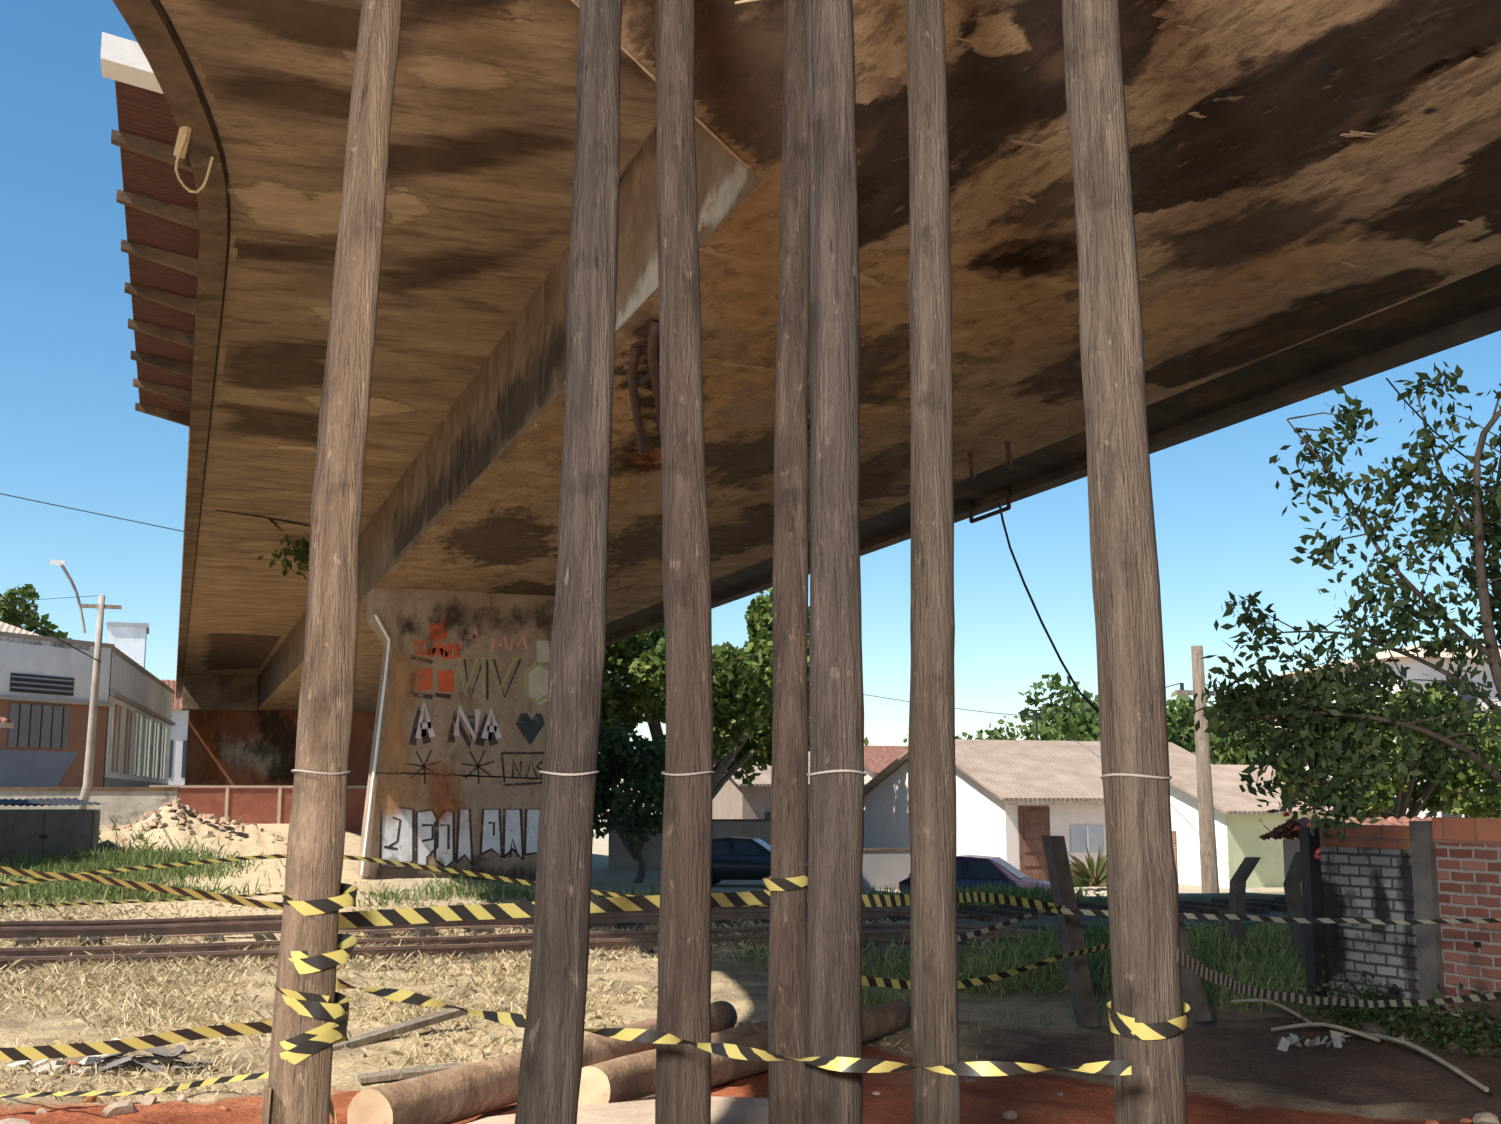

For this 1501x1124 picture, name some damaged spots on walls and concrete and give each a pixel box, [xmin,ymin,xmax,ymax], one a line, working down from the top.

damp [856,85,909,248]
damp [946,0,1067,195]
damp [1119,0,1167,86]
damp [1129,0,1501,270]
damp [952,180,1079,364]
damp [1014,336,1083,403]
damp [1145,269,1451,388]
damp [395,279,566,628]
damp [437,605,469,641]